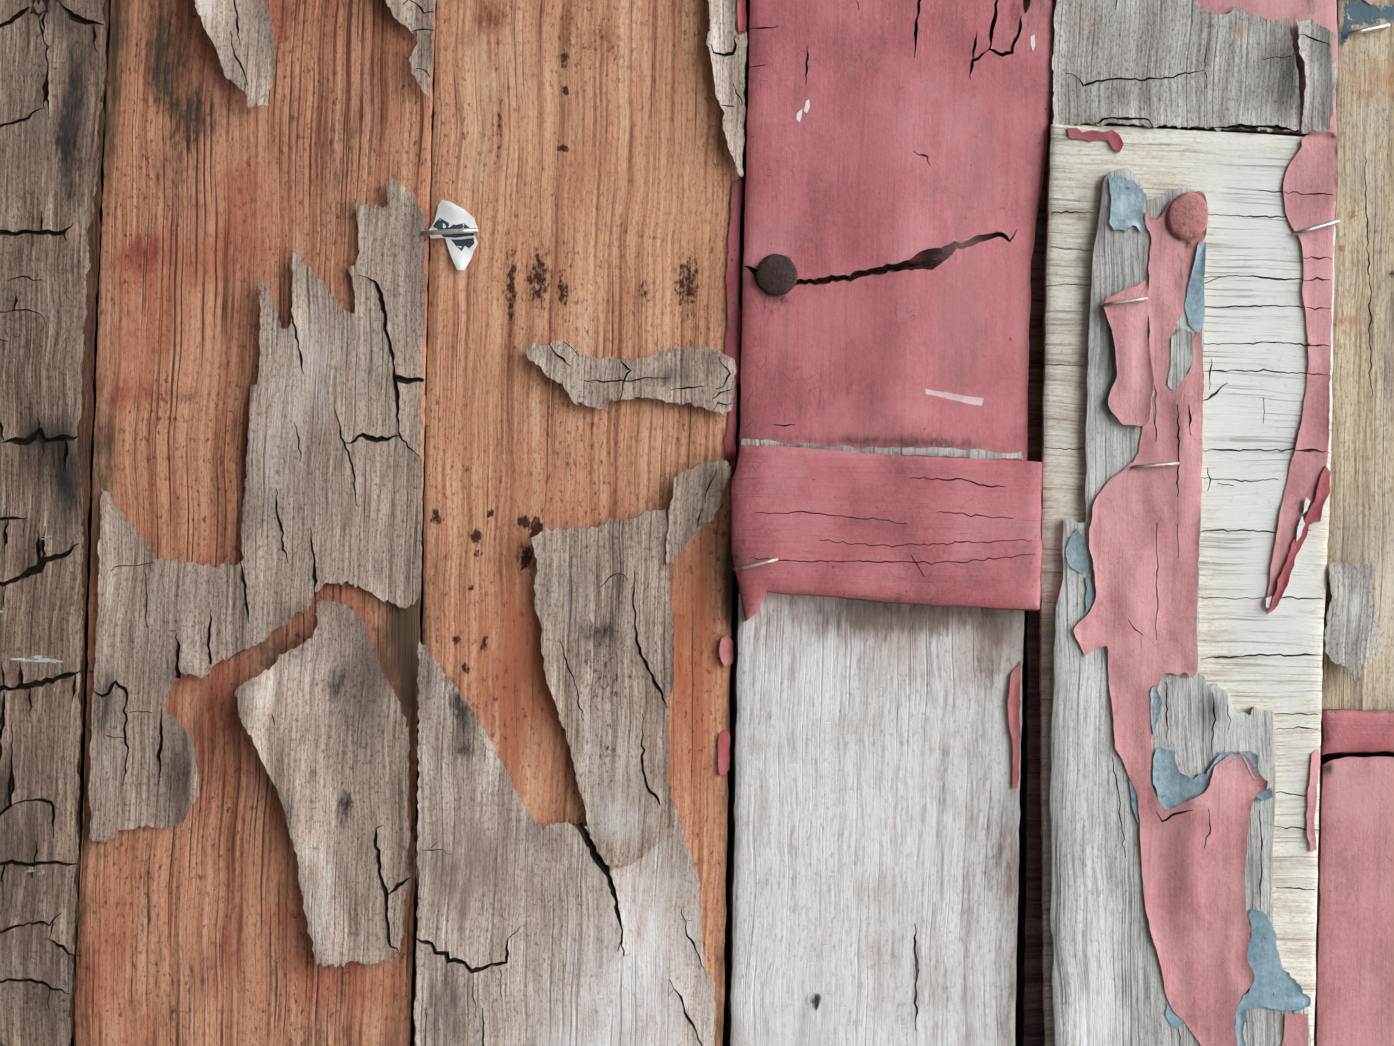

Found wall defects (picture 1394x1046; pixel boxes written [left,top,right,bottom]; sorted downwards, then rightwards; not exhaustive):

crack [0,3,104,128]
crack [969,0,1022,80]
peeling [1067,128,1124,153]
crack [795,229,1017,285]
crack [335,275,424,507]
peeling [1266,132,1338,613]
crack [0,516,79,608]
peeling [719,635,733,667]
peeling [1066,175,1311,1046]
crack [0,661,163,956]
peeling [717,730,730,776]
peeling [1306,749,1321,852]